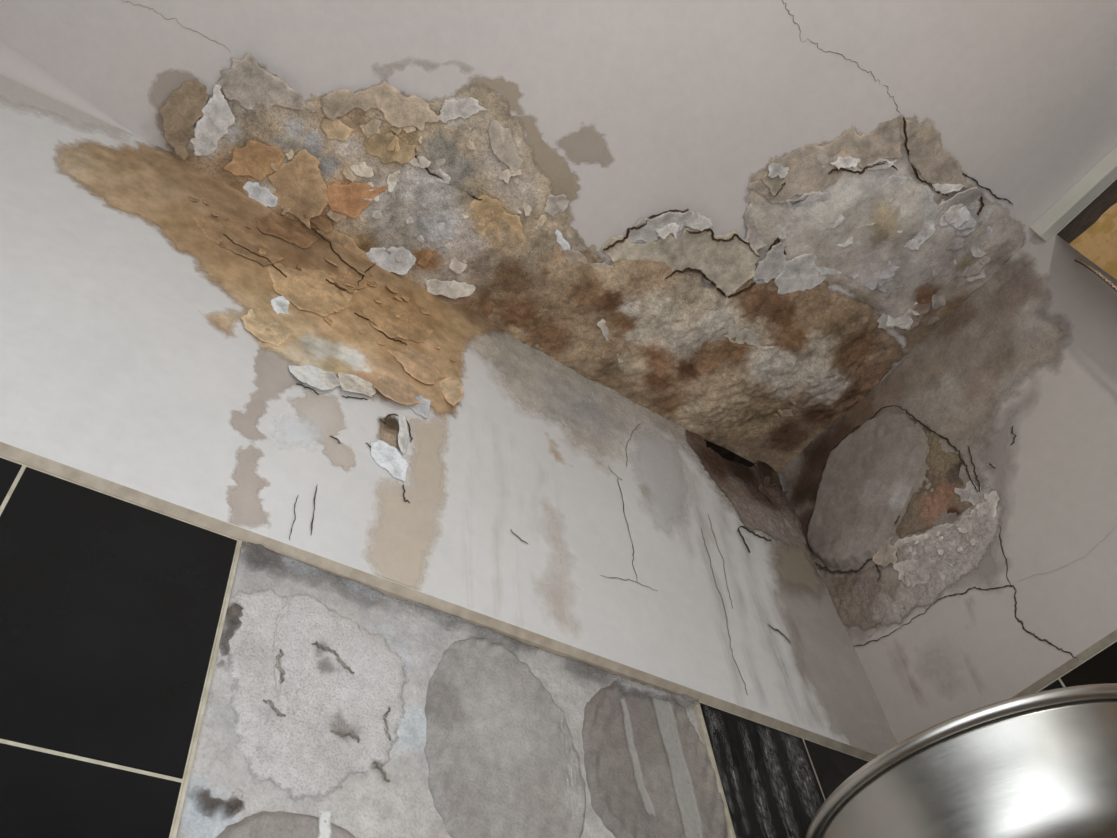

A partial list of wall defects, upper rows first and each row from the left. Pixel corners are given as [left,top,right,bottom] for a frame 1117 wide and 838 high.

crack [782,0,900,113]
spalling [159,53,1025,474]
leakage [55,114,711,590]
peeling [288,365,464,504]
spalling [247,543,533,650]
crack [600,423,657,591]
crack [815,516,900,582]
spalling [819,481,1000,630]
crack [823,405,997,492]
crack [853,519,1117,662]
spalling [226,589,408,799]
spalling [551,653,699,704]